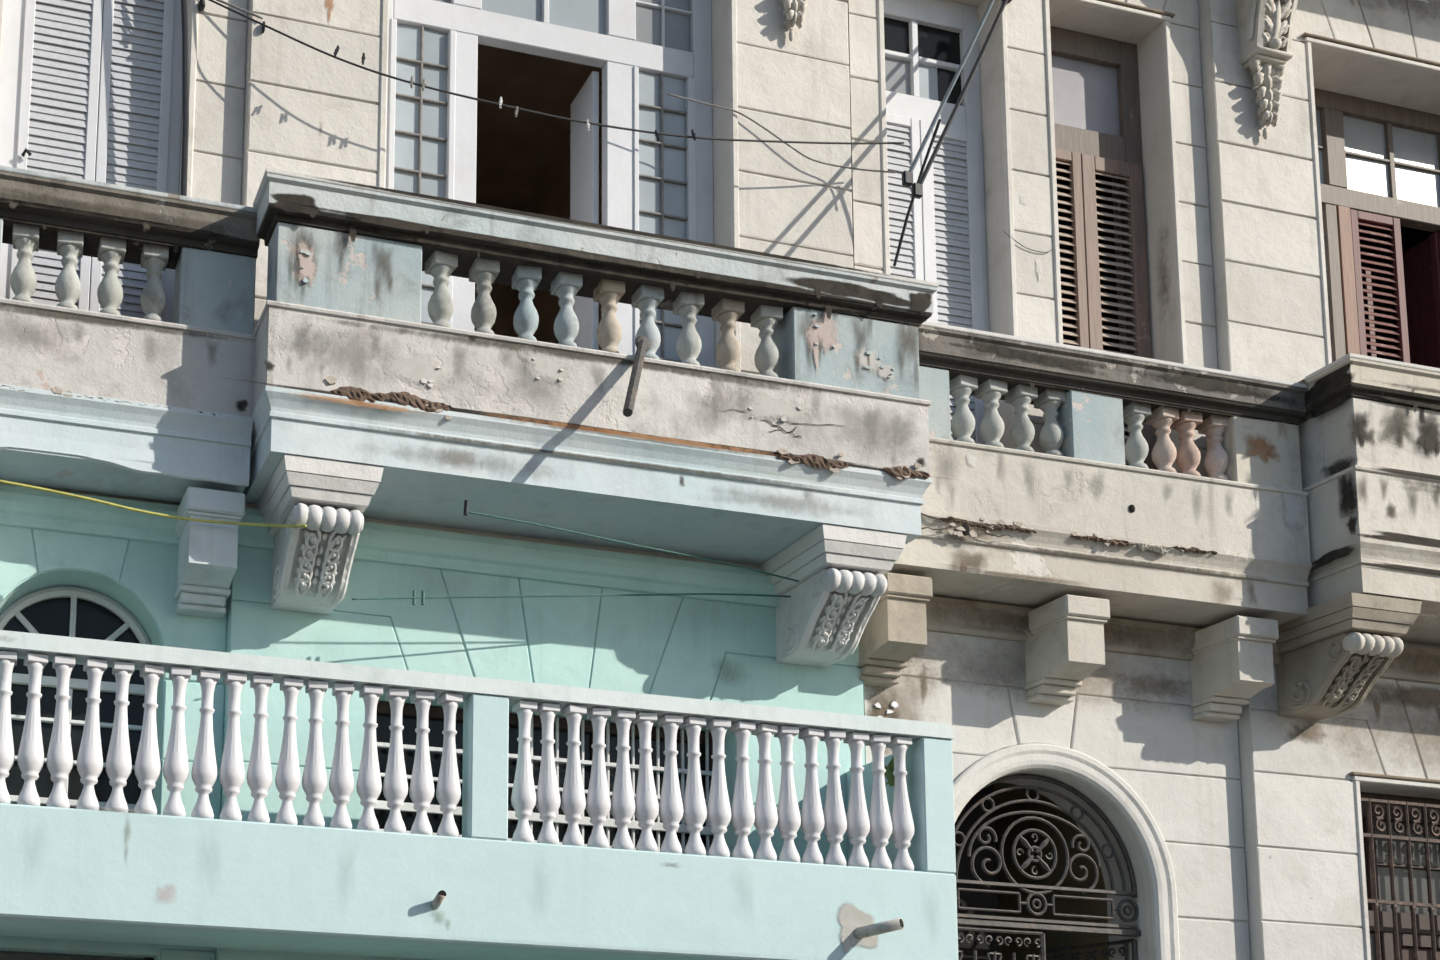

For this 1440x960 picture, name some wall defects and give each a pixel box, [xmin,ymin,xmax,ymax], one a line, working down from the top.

peeling [298,242,317,286]
peeling [806,311,837,372]
peeling [855,348,896,380]
spalling [777,448,850,473]
spalling [882,458,930,480]
rust [1249,437,1275,462]
damp [1304,362,1440,574]
spalling [939,517,1037,539]
spalling [1071,532,1137,547]
spalling [1173,546,1217,555]